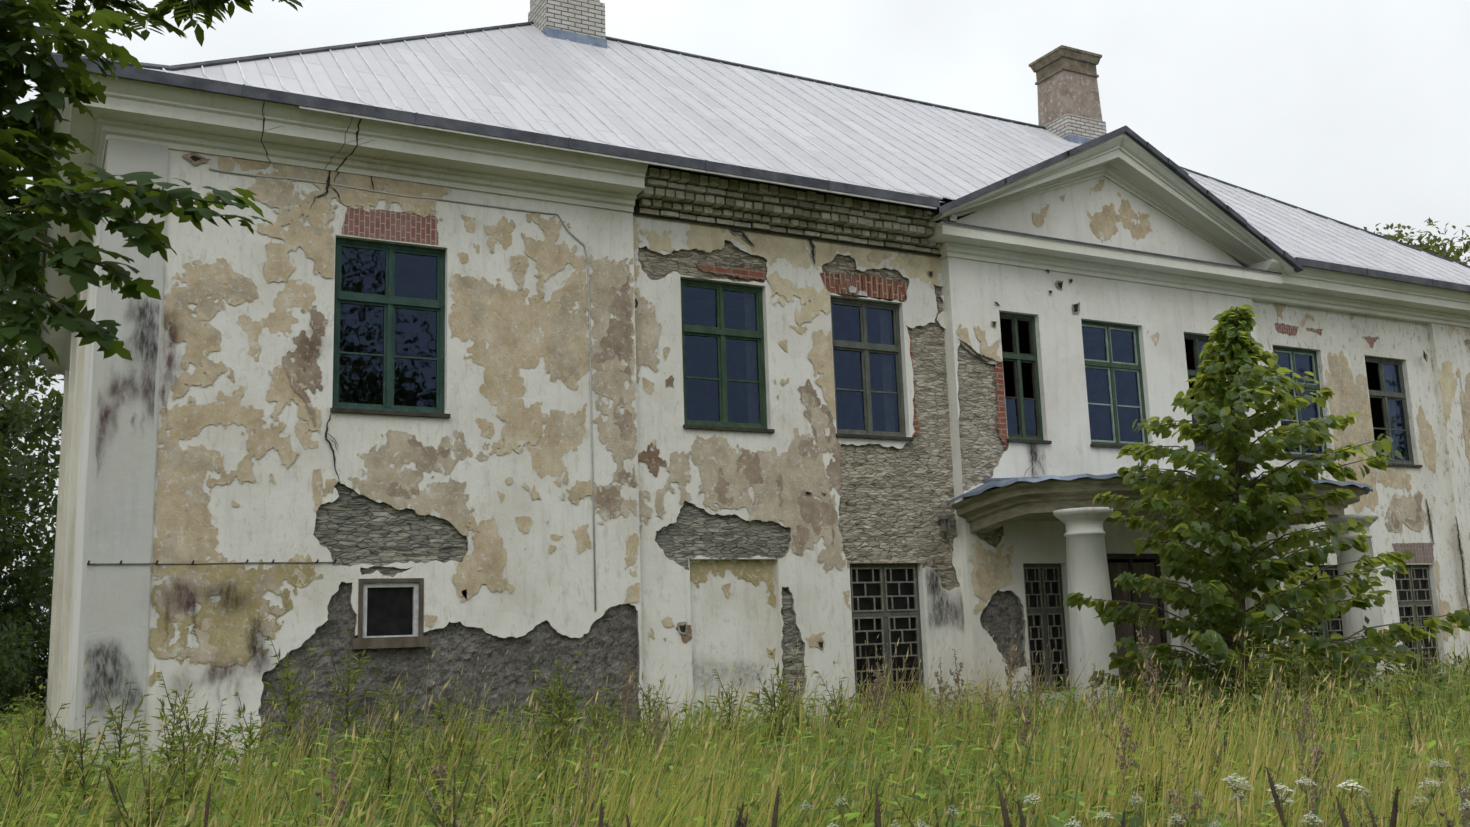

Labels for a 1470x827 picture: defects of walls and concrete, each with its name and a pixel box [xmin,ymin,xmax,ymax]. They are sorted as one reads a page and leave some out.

crack [261,102,281,162]
crack [310,117,374,208]
flaking render [1274,303,1323,336]
crack [285,367,339,479]
spalling [149,152,1027,760]
peeling [1325,350,1470,641]
damp [87,646,137,705]